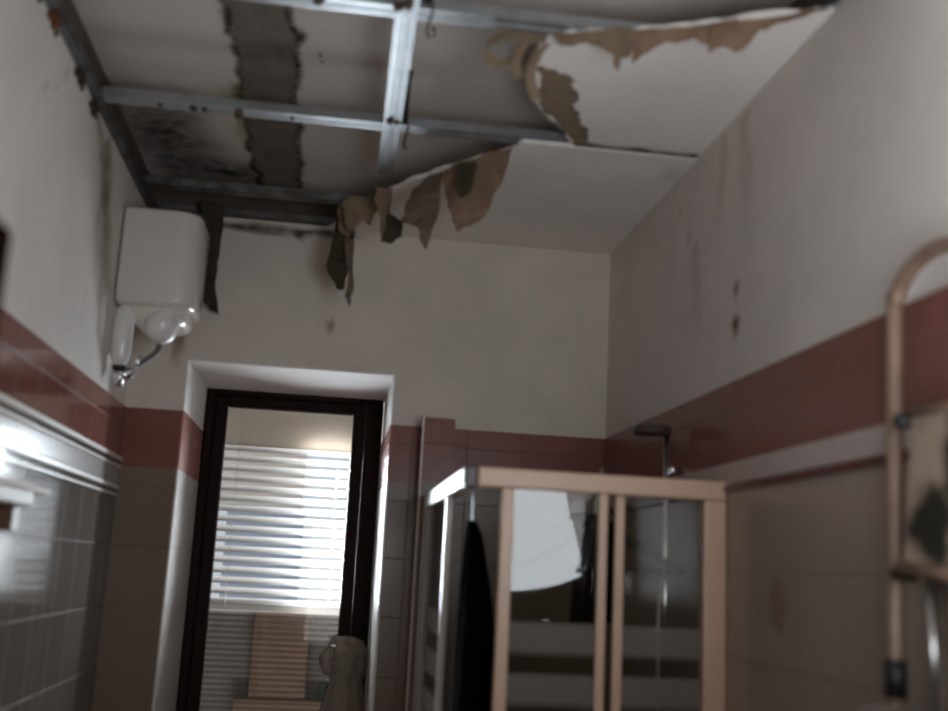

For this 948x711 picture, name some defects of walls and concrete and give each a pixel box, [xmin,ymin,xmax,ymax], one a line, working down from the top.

flaking render [37,0,61,38]
peeling [221,0,305,105]
flaking render [74,67,100,120]
peeling [243,117,305,189]